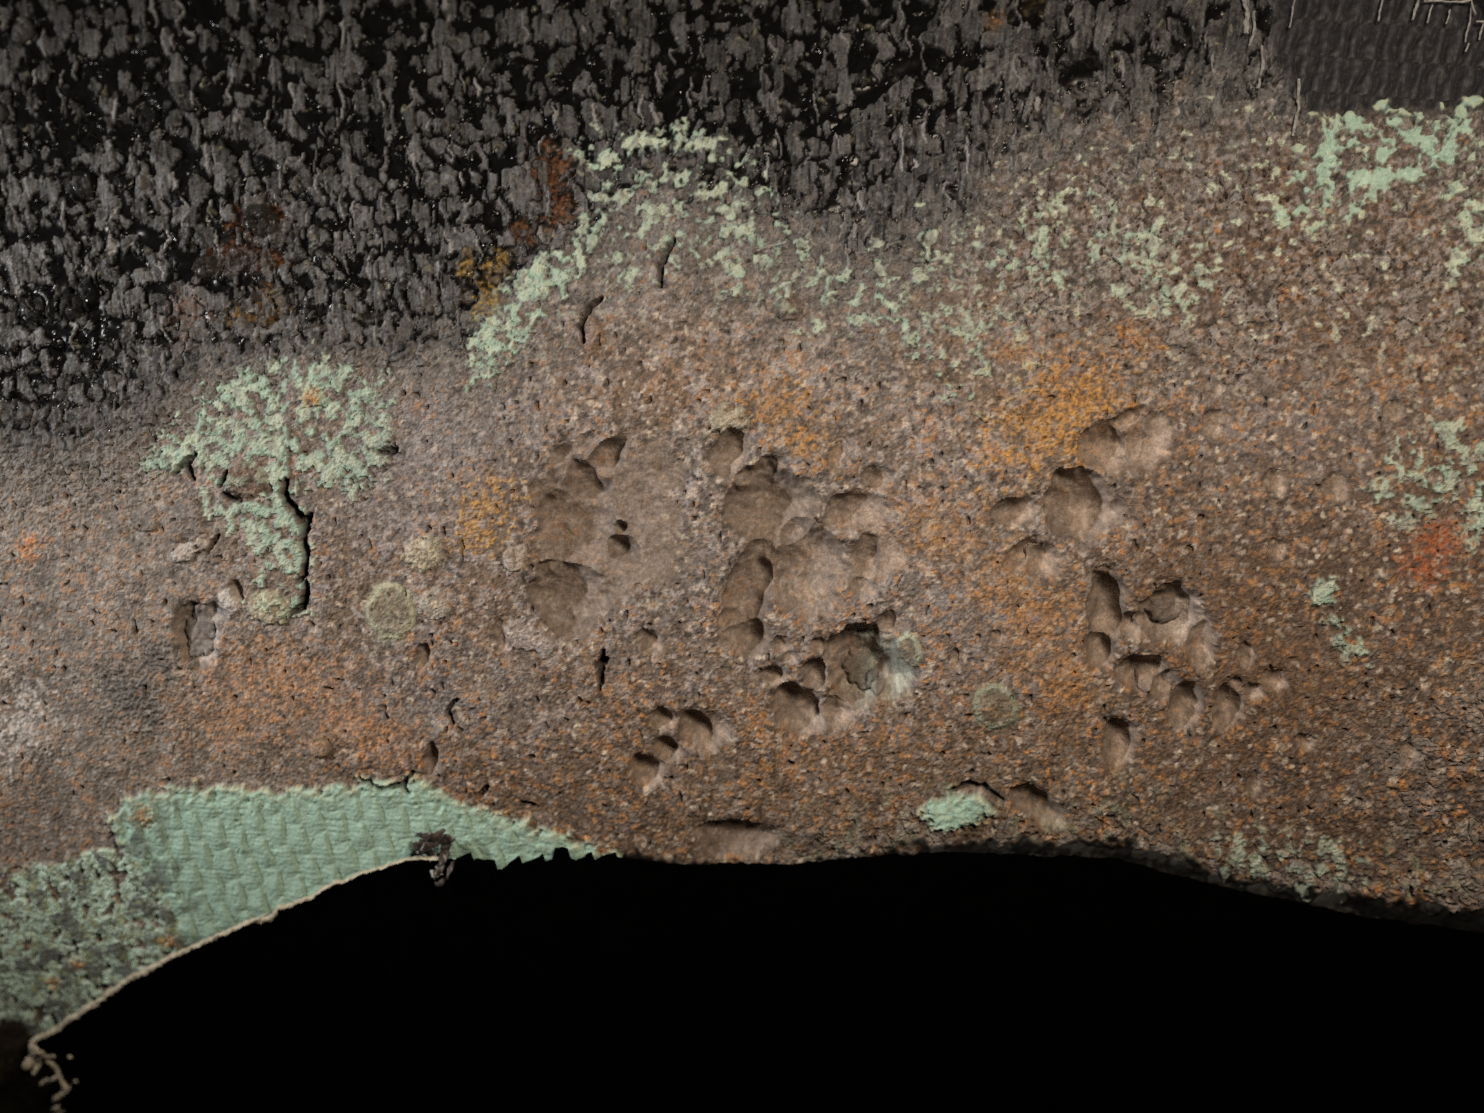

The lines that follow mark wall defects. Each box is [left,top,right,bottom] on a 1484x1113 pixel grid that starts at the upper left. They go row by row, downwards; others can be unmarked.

hole [628,705,738,789]
hole [513,415,920,743]
rust [707,346,879,485]
hole [1102,716,1140,767]
hole [989,403,1292,739]
rust [878,293,1484,801]